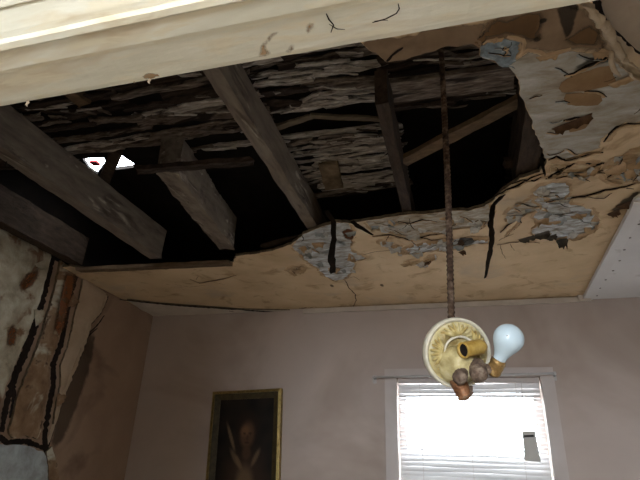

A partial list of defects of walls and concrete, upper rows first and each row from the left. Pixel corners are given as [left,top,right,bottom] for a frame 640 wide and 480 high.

crack [372,3,400,23]
peeling [558,4,578,37]
peeling [363,35,640,268]
peeling [284,223,369,287]
crack [0,255,272,453]